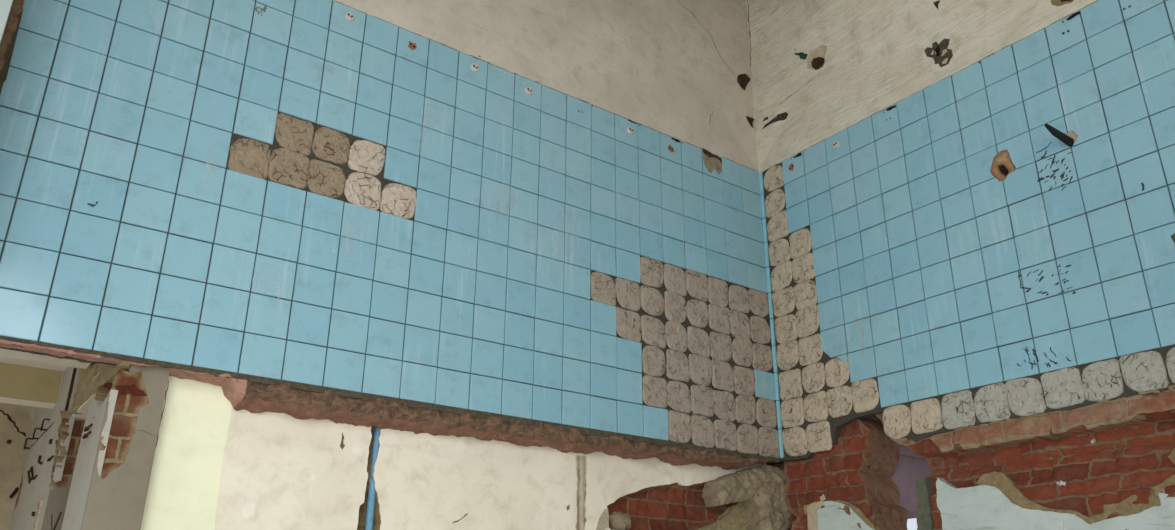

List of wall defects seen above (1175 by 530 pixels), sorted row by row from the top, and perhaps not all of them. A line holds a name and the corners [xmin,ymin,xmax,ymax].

spalling [0,0,24,94]
peeling [228,113,417,219]
spalling [702,147,722,174]
spalling [990,150,1016,181]
peeling [0,164,1175,530]